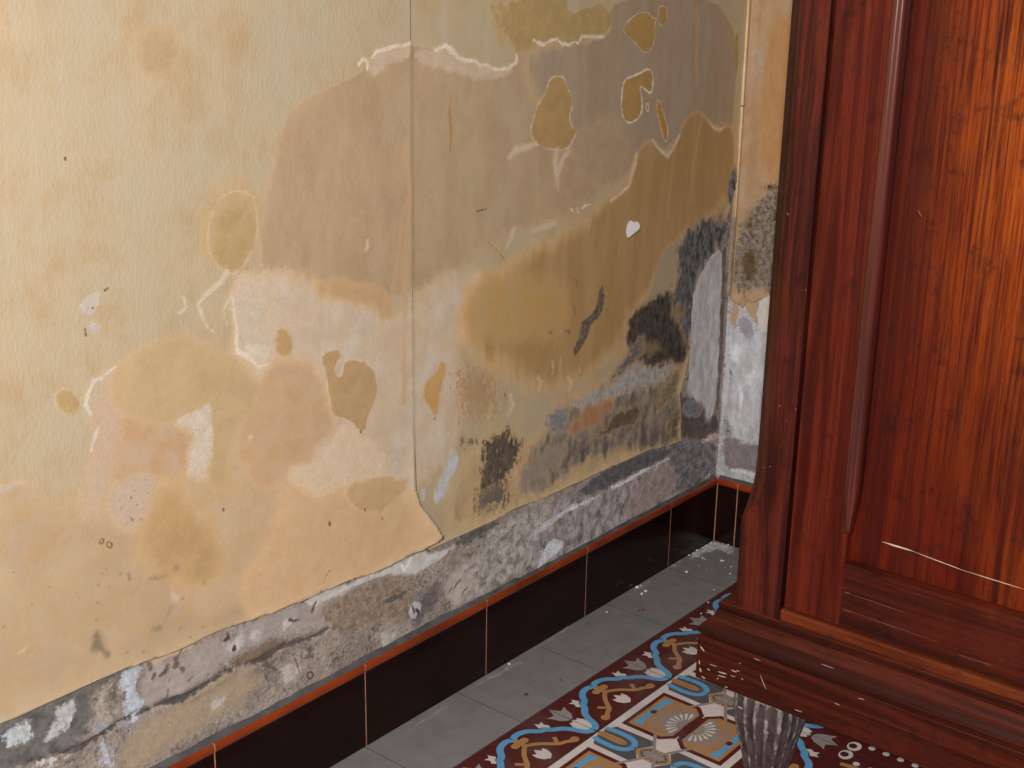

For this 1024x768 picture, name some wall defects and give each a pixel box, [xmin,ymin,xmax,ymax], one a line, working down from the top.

peeling [626,221,641,240]
peeling [687,249,767,445]
water stain [0,0,790,768]
peeling [307,546,455,613]
peeling [445,570,478,601]
peeling [409,601,421,619]
peeling [224,625,262,653]
peeling [380,629,396,646]
peeling [278,663,314,683]
peeling [0,700,76,748]
peeling [89,657,193,768]